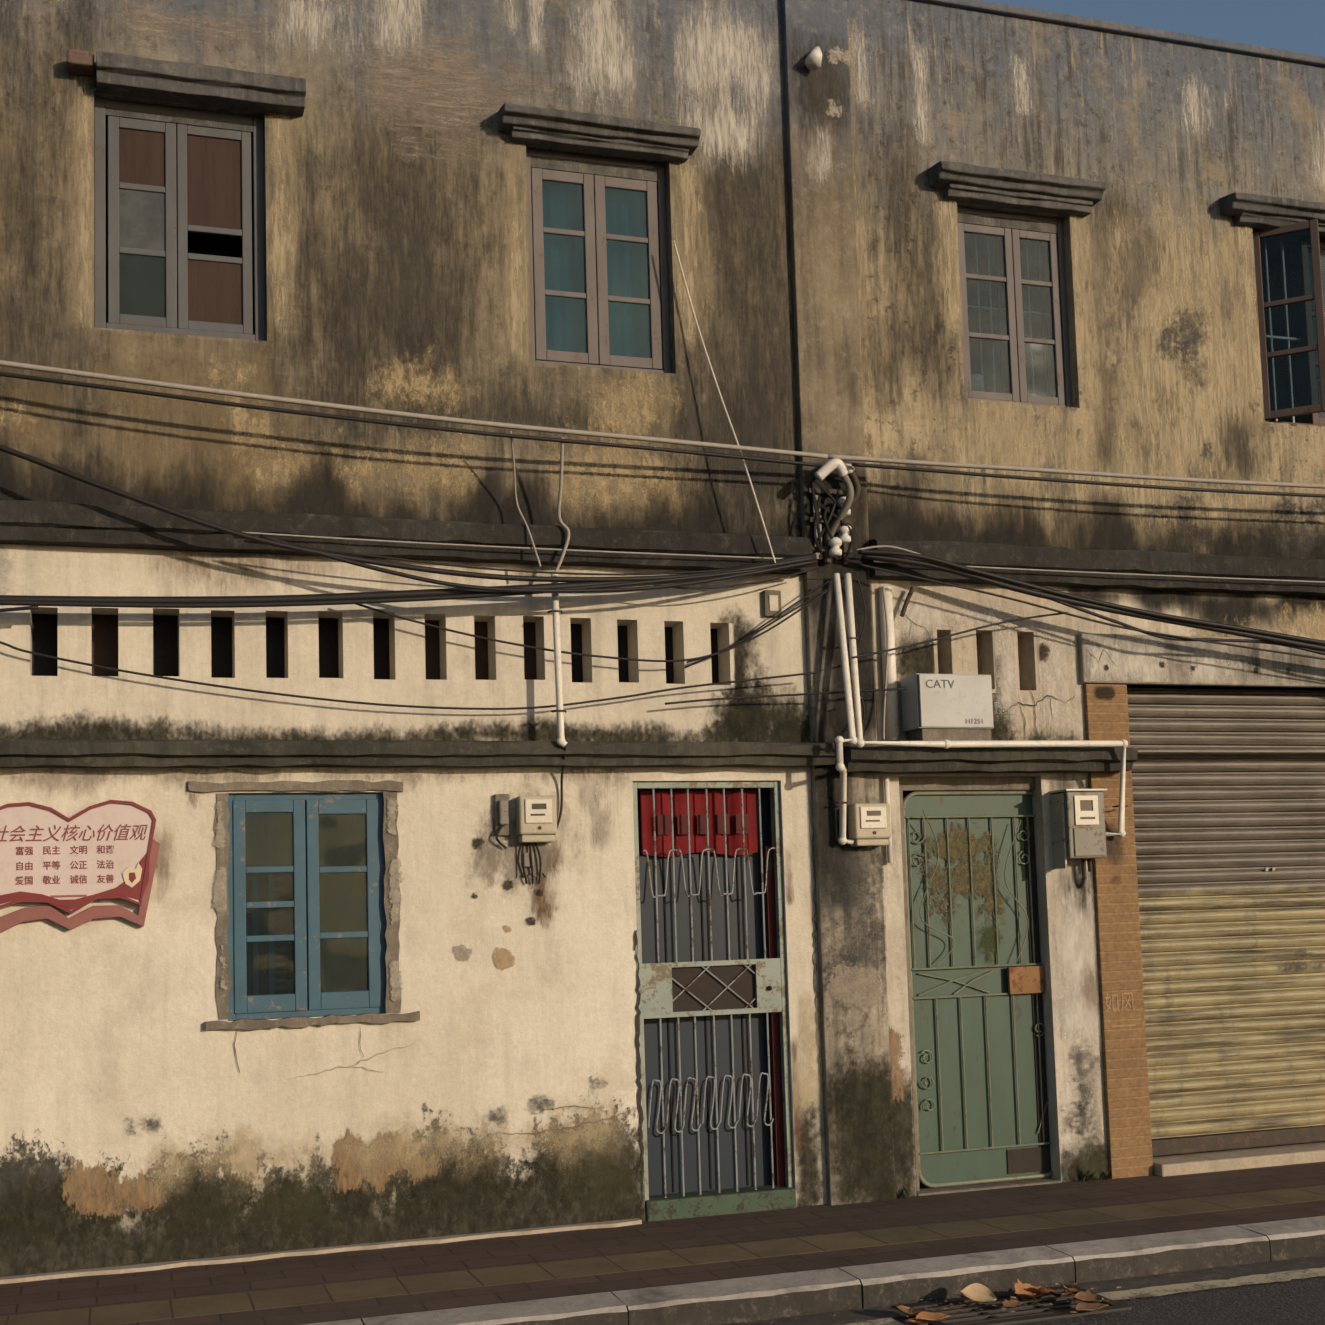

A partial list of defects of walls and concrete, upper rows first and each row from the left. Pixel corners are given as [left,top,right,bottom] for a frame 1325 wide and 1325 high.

water stain [567,0,634,100]
water stain [674,3,776,171]
water stain [792,35,868,180]
water stain [266,119,298,325]
water stain [1156,309,1206,386]
water stain [652,398,799,508]
water stain [1149,422,1254,547]
crack [1001,690,1076,738]
crack [289,1029,414,1080]
water stain [1065,1047,1096,1134]
peeling [62,1158,167,1221]
peeling [331,1129,442,1195]